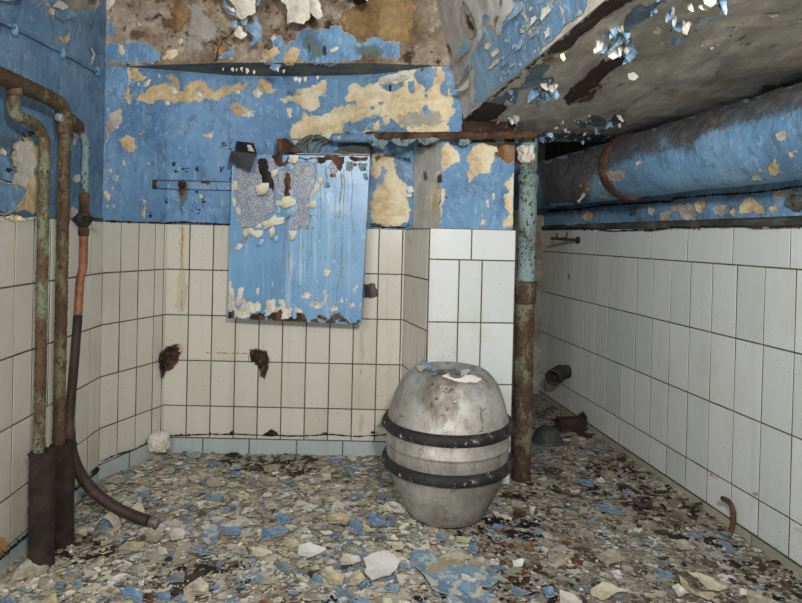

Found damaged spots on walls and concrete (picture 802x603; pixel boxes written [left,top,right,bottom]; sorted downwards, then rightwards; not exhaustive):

spalling [759,78,802,92]
flaking render [44,0,727,229]
flaking render [0,136,38,222]
peeling [232,145,337,250]
peeling [647,188,802,221]
peeling [752,159,780,181]
peeling [228,281,361,324]
spalling [355,283,379,299]